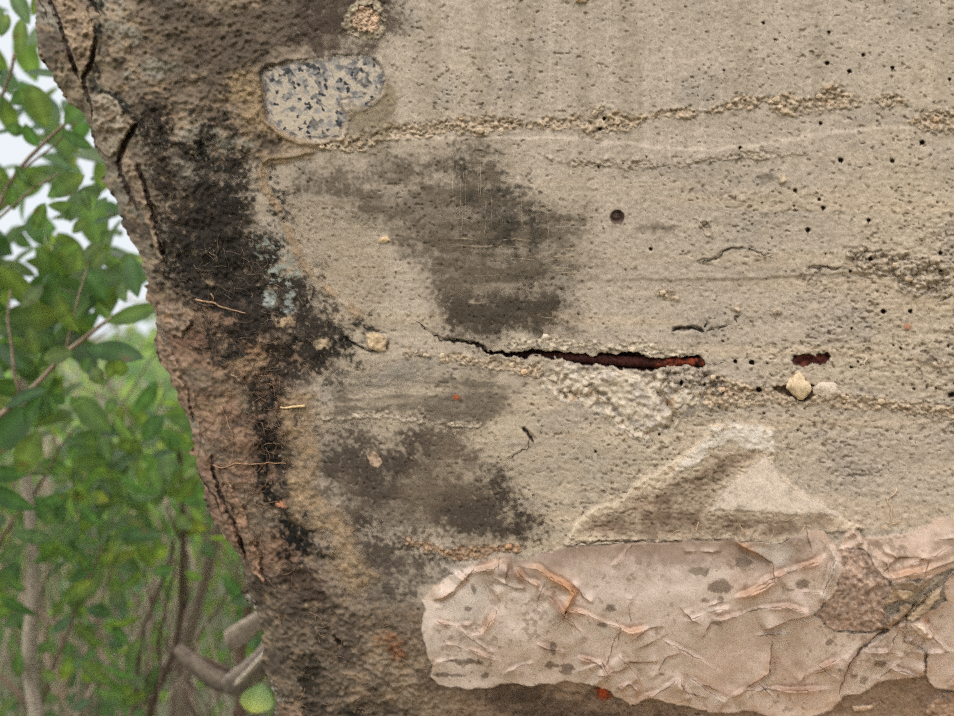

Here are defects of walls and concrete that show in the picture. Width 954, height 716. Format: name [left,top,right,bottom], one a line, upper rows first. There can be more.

damp [153,0,403,129]
crack [672,315,741,333]
damp [133,106,584,602]
crack [340,327,390,353]
crack [416,321,729,371]
corrosion [515,352,705,368]
peeling [562,423,864,546]
peeling [852,703,878,711]
peeling [925,692,954,716]